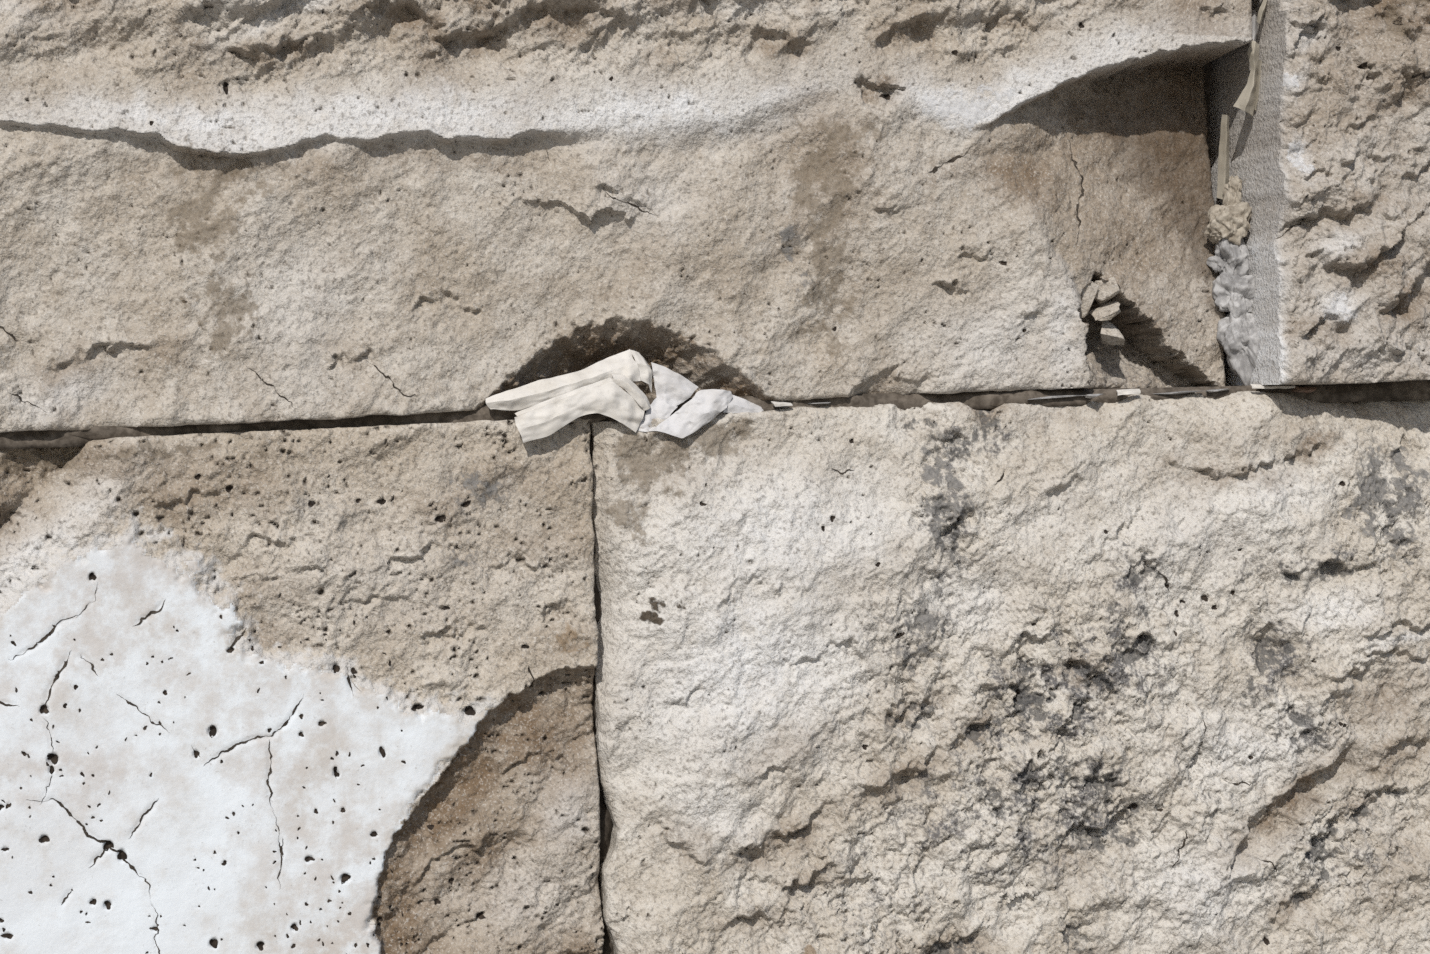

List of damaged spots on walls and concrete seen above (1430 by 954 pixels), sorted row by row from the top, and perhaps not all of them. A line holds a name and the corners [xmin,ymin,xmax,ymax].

crack [1068,139,1084,246]
spalling [948,46,1239,400]
crack [0,588,304,954]